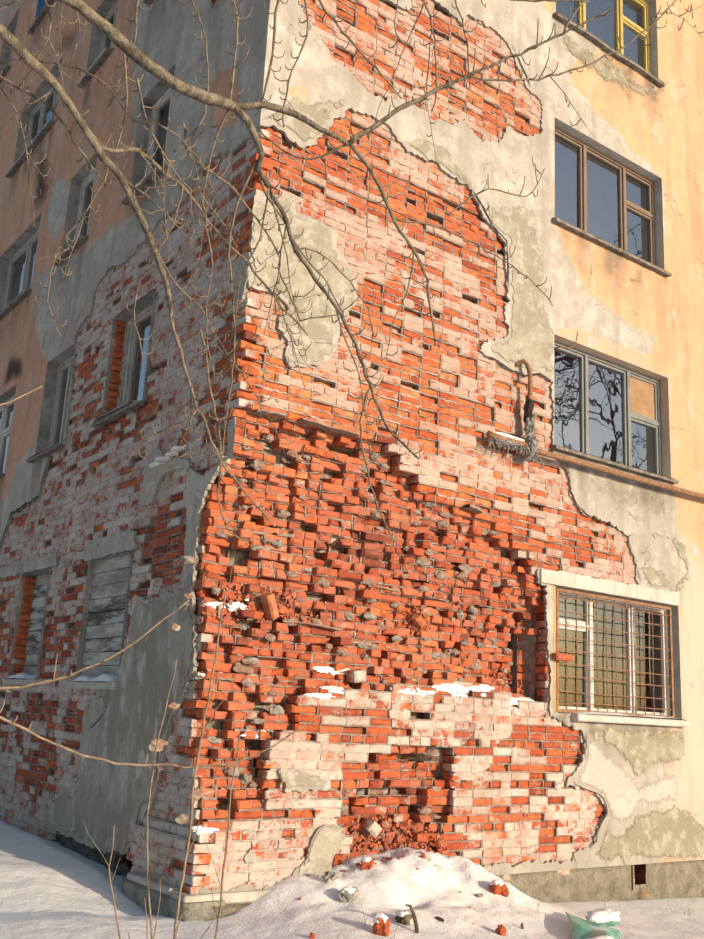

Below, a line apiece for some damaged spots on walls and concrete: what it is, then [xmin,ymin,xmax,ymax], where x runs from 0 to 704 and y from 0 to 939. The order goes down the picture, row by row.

spalling [300,0,542,143]
spalling [0,97,690,840]
spalling [182,591,605,894]